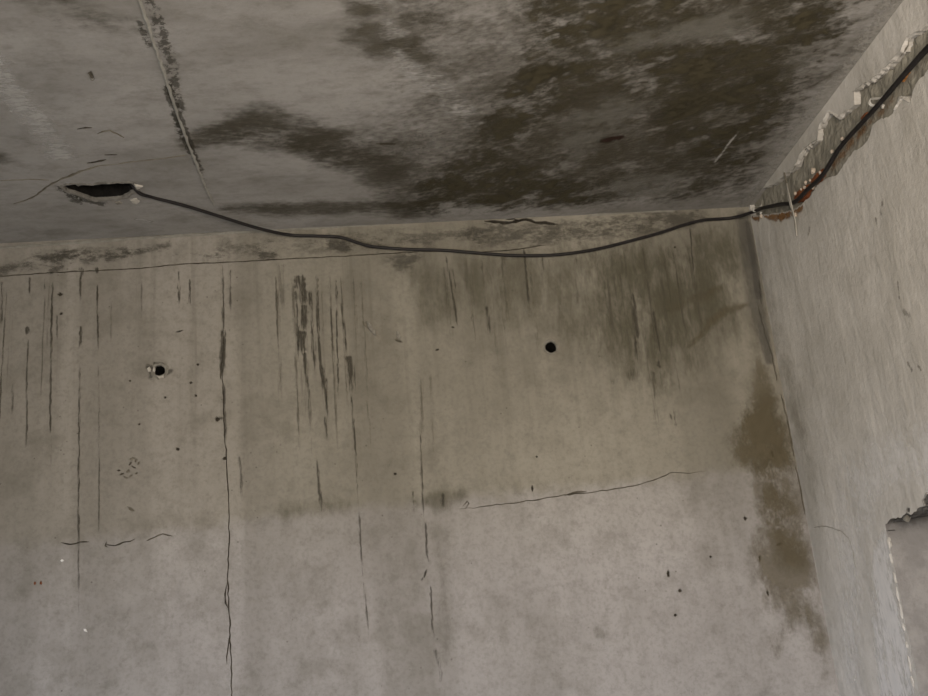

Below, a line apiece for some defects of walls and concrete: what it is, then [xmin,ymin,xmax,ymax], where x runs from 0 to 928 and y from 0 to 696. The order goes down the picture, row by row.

water stain [137,0,903,217]
flaking render [755,30,928,219]
crack [0,127,185,204]
crack [0,251,435,277]
crack [484,218,558,252]
rust [752,206,803,221]
water stain [294,275,355,435]
crack [463,471,702,509]
water stain [760,480,811,619]